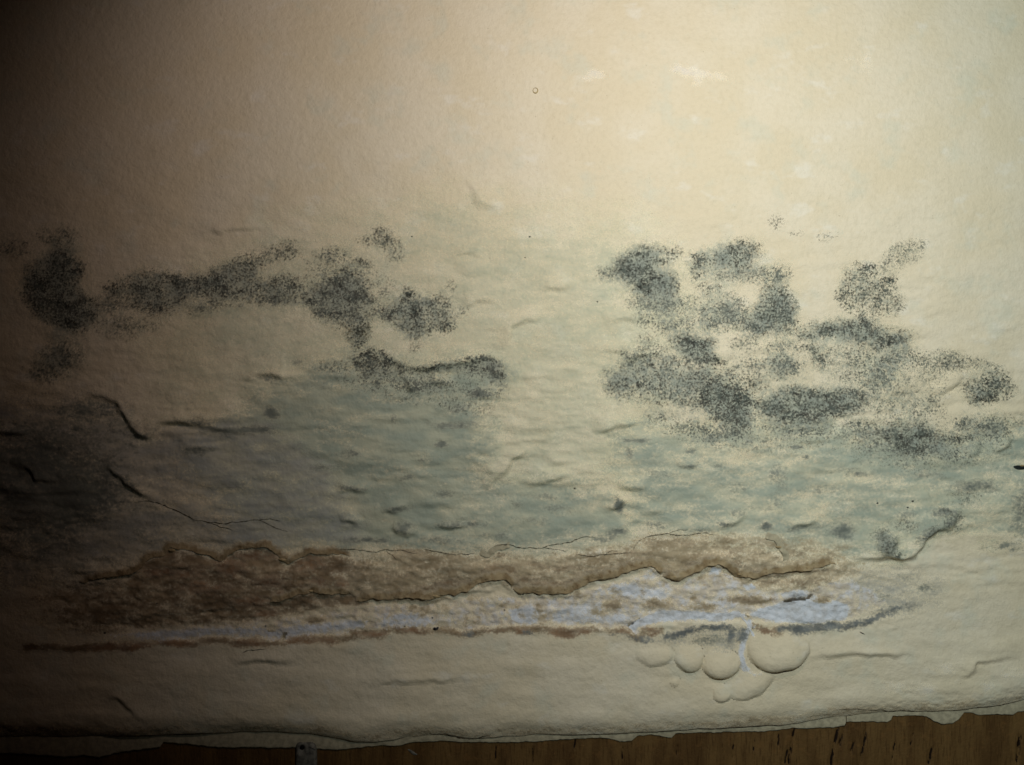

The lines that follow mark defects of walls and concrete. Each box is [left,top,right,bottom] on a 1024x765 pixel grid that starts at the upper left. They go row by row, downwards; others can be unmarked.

leakage [0,205,1024,675]
crack [140,501,288,532]
peeling [79,539,350,583]
spalling [129,532,885,641]